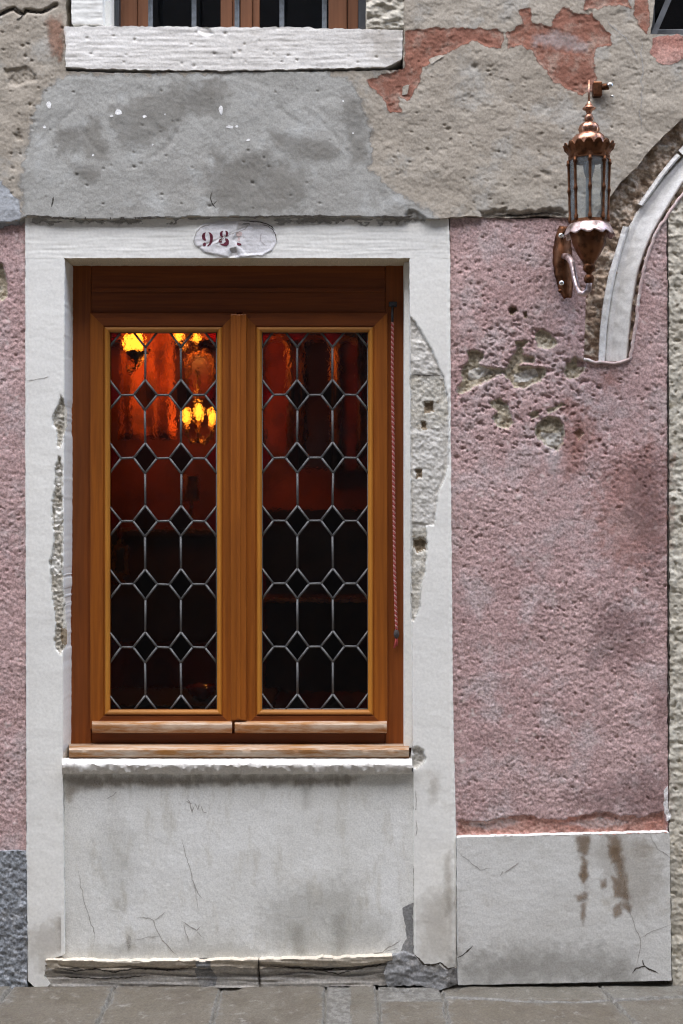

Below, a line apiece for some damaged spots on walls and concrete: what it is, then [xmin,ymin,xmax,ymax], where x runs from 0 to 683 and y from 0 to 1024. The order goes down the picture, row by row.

peeling [367,0,683,113]
peeling [49,396,68,655]
peeling [409,316,558,622]
spalling [529,402,584,452]
crack [56,846,204,979]
crack [619,855,669,973]